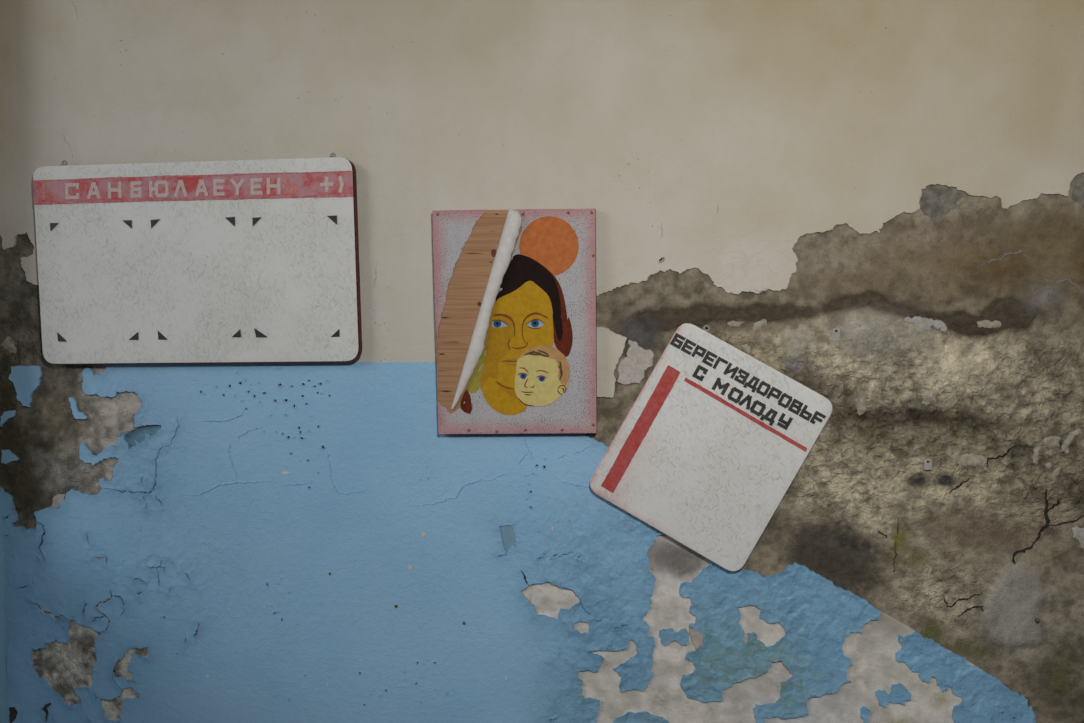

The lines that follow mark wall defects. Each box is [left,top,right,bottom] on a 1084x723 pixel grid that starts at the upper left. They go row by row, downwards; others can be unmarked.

damp [624,250,1084,358]
flaking render [0,234,161,529]
crack [105,445,170,493]
flaking render [578,173,1084,723]
crack [1012,489,1084,564]
crack [21,566,160,635]
peeling [521,575,624,634]
peeling [31,620,99,722]
peeling [102,643,178,721]